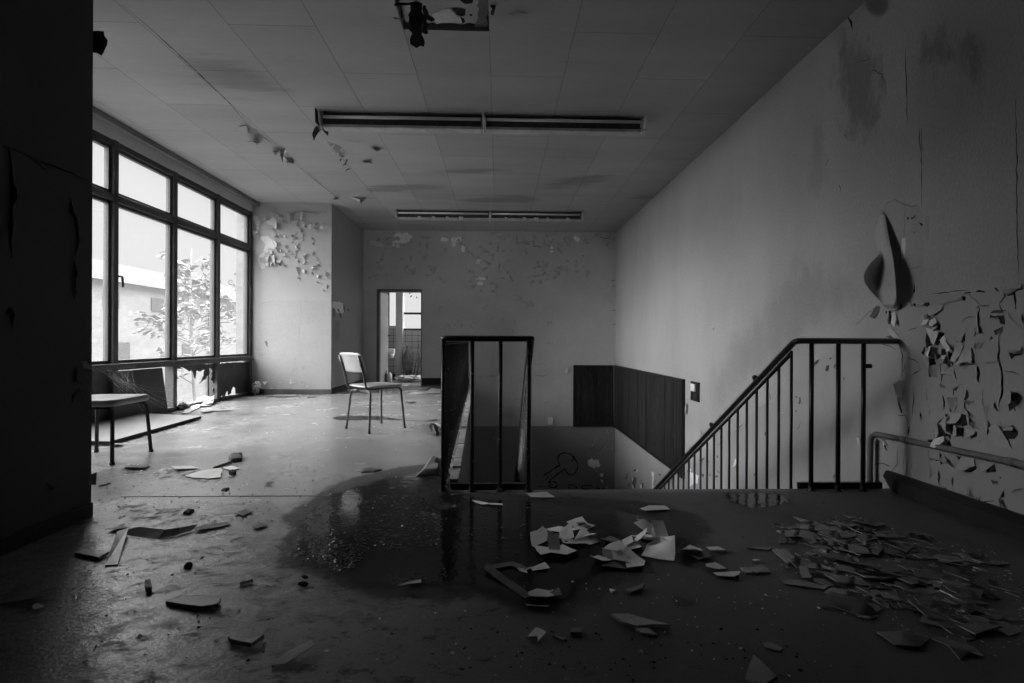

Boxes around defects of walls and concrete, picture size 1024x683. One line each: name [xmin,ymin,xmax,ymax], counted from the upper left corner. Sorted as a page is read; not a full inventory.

peeling [125,7,336,200]
flaking render [399,0,479,25]
crack [860,45,922,257]
peeling [252,208,329,291]
peeling [855,281,1023,473]